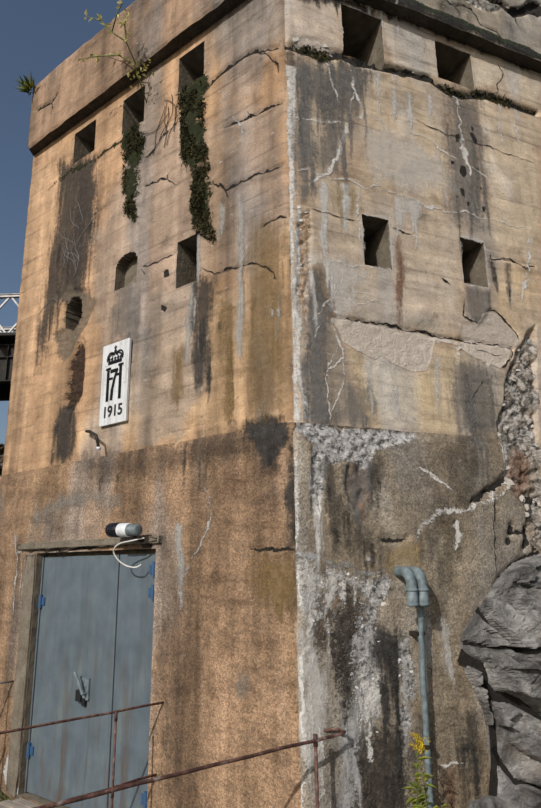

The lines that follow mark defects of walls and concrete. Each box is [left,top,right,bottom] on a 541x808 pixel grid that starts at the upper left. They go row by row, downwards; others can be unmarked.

crack [447,0,535,38]
spalling [458,0,541,18]
leakage [36,153,98,365]
crack [50,132,129,188]
spalling [285,66,415,514]
crack [204,46,536,419]
leakage [444,97,490,243]
leakage [51,406,76,463]
spalling [332,312,541,552]
crack [380,440,540,578]
leakage [297,579,412,808]